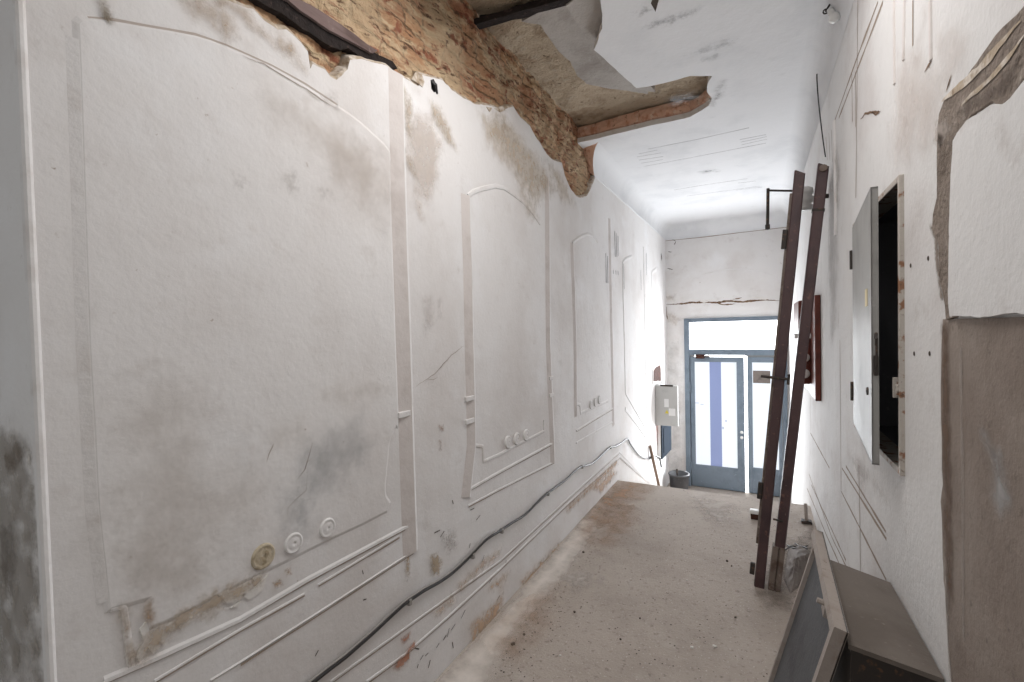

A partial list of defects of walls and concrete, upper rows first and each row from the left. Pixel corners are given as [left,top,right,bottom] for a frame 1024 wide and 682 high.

flaking render [229,0,595,198]
crack [666,297,779,319]
peeling [126,574,268,663]